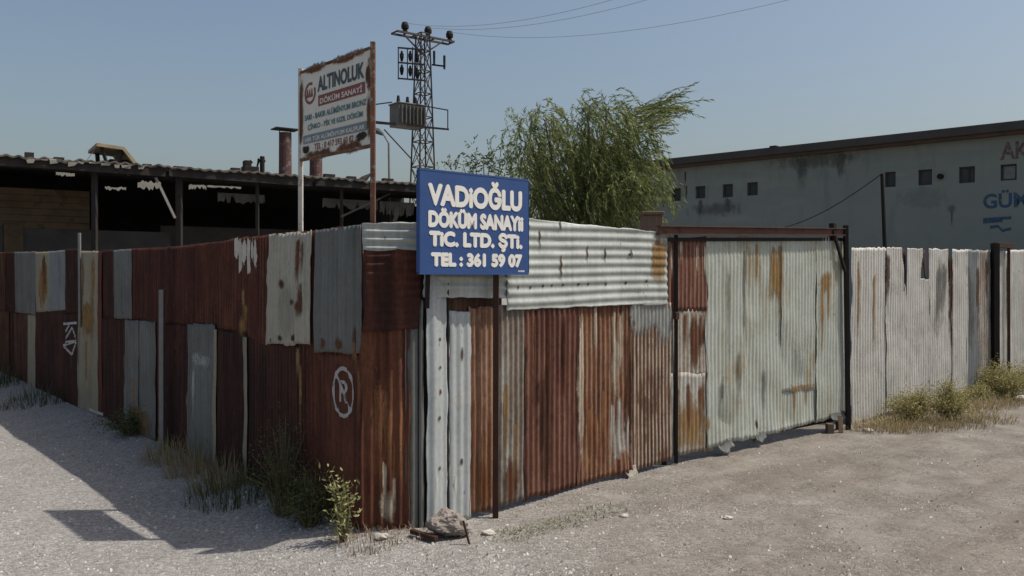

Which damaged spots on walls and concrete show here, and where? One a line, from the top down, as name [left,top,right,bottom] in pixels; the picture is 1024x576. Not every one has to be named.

rust [39,258,47,301]
peeling [234,237,257,275]
rust [290,240,303,315]
rust [646,240,666,283]
rust [771,247,783,301]
rust [821,274,831,330]
rust [857,263,876,339]
rust [684,313,704,369]
rust [374,385,403,475]
rust [534,311,566,473]
rust [678,382,710,450]
rust [792,384,815,409]